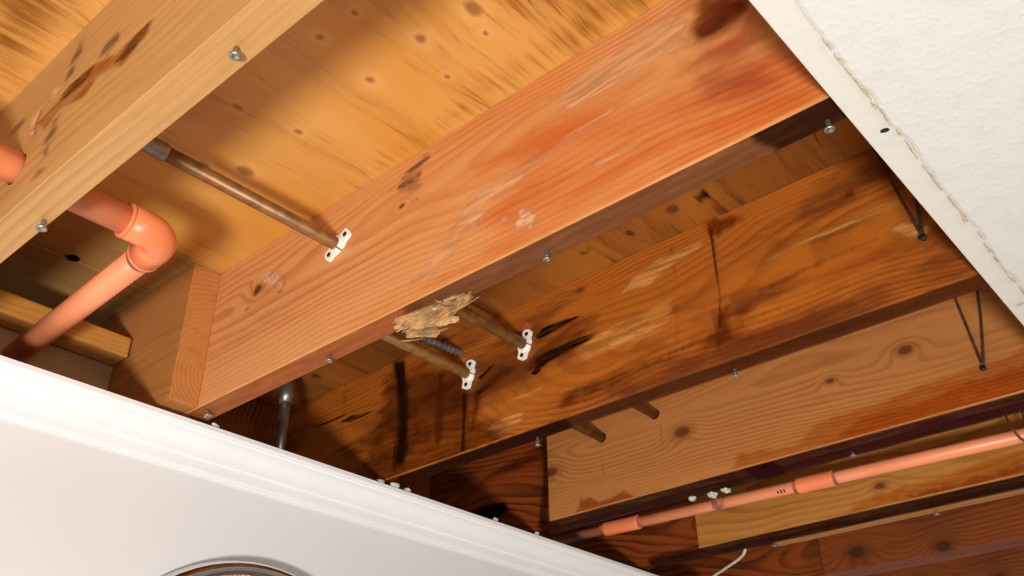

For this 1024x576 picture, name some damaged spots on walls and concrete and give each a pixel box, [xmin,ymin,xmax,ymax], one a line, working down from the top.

damp [694,0,747,36]
peeling [821,36,968,223]
damp [398,156,429,189]
damp [405,97,847,314]
peeling [396,291,479,341]
crack [532,316,594,375]
damp [368,275,1024,537]